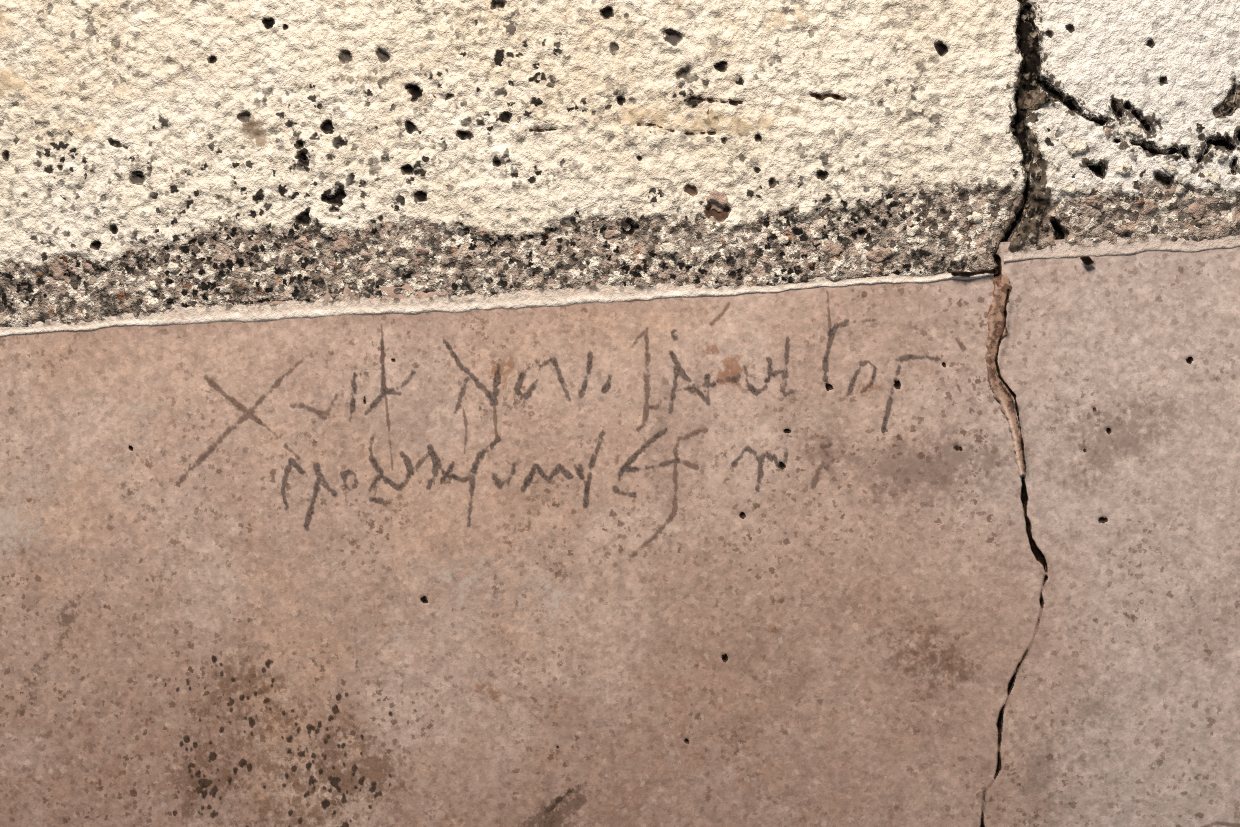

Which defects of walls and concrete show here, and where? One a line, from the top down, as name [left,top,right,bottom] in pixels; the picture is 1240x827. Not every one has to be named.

crack [951,0,1240,827]